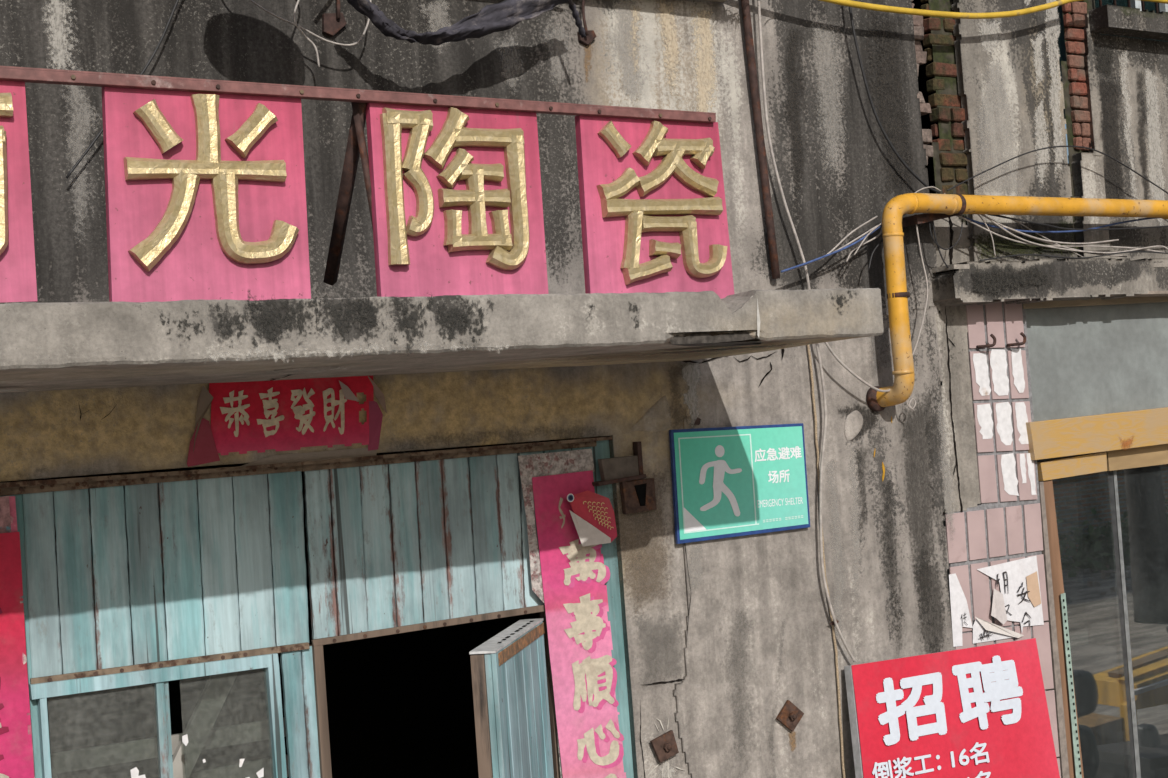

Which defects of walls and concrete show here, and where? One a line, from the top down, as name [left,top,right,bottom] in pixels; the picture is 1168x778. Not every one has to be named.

spalling [911,0,969,195]
peeling [1031,0,1095,198]
damp [1094,43,1164,200]
damp [160,289,494,360]
crack [640,679,684,777]